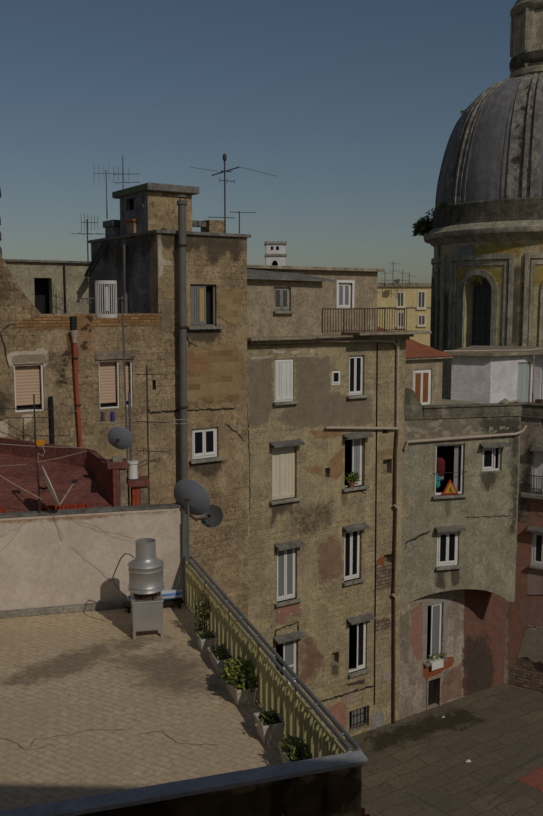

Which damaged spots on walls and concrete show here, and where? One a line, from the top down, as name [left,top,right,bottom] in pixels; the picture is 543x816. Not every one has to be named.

crack [0,324,17,369]
crack [405,530,431,548]
peeling [400,501,543,696]
crack [1,729,214,751]
water stain [77,767,361,816]